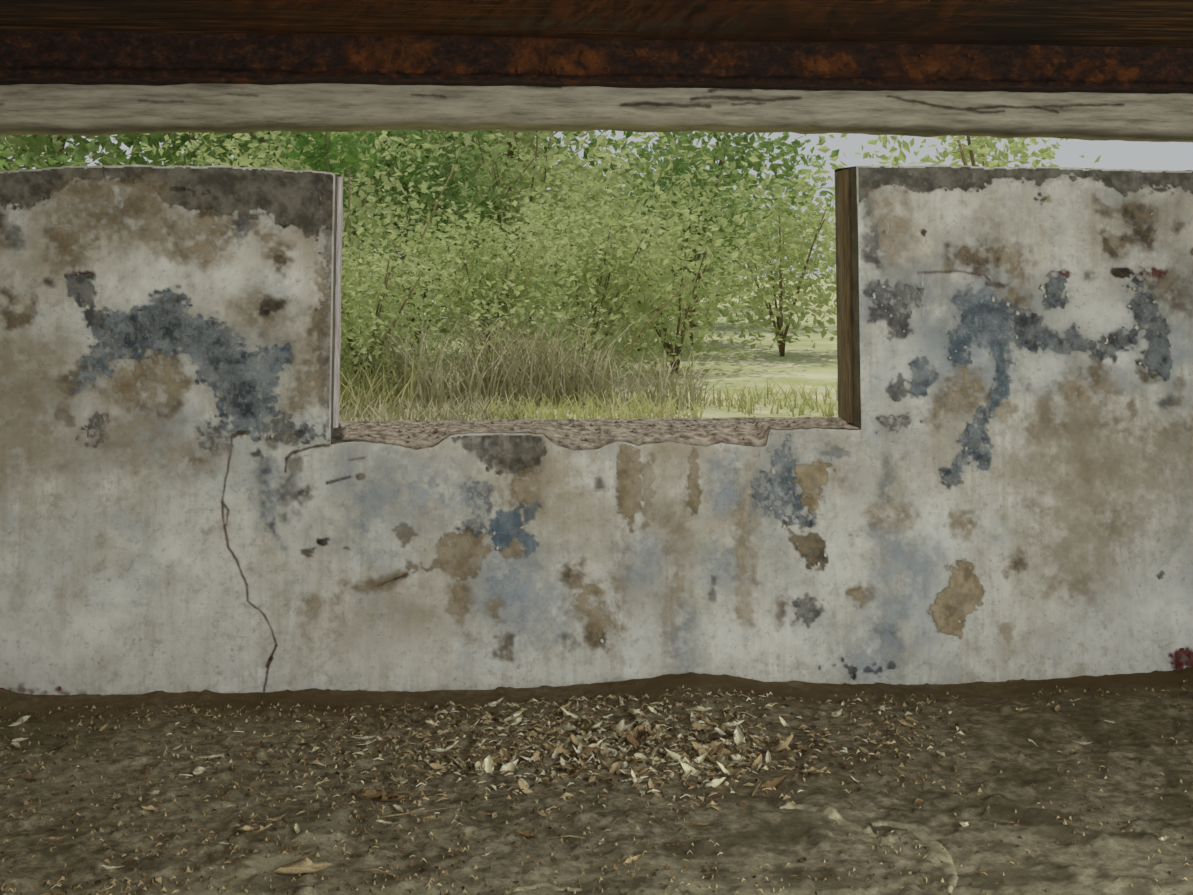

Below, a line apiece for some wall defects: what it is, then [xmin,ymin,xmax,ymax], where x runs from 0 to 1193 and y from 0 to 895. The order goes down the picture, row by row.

peeling [55,271,326,456]
peeling [863,279,924,338]
peeling [876,414,922,434]
peeling [887,357,938,401]
peeling [939,268,1185,489]
crack [222,431,277,692]
flaking render [454,435,547,558]
peeling [749,434,828,570]